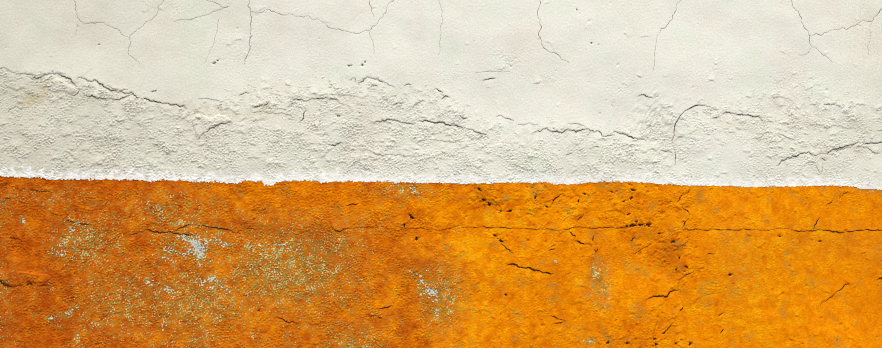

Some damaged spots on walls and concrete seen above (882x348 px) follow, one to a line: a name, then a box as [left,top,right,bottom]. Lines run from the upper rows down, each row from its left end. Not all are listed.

crack [74,0,394,64]
crack [791,0,881,63]
crack [6,68,489,157]
crack [502,116,635,145]
crack [660,104,882,170]
crack [131,224,259,236]
crack [445,215,646,274]
crack [665,192,882,250]
crack [646,272,693,334]